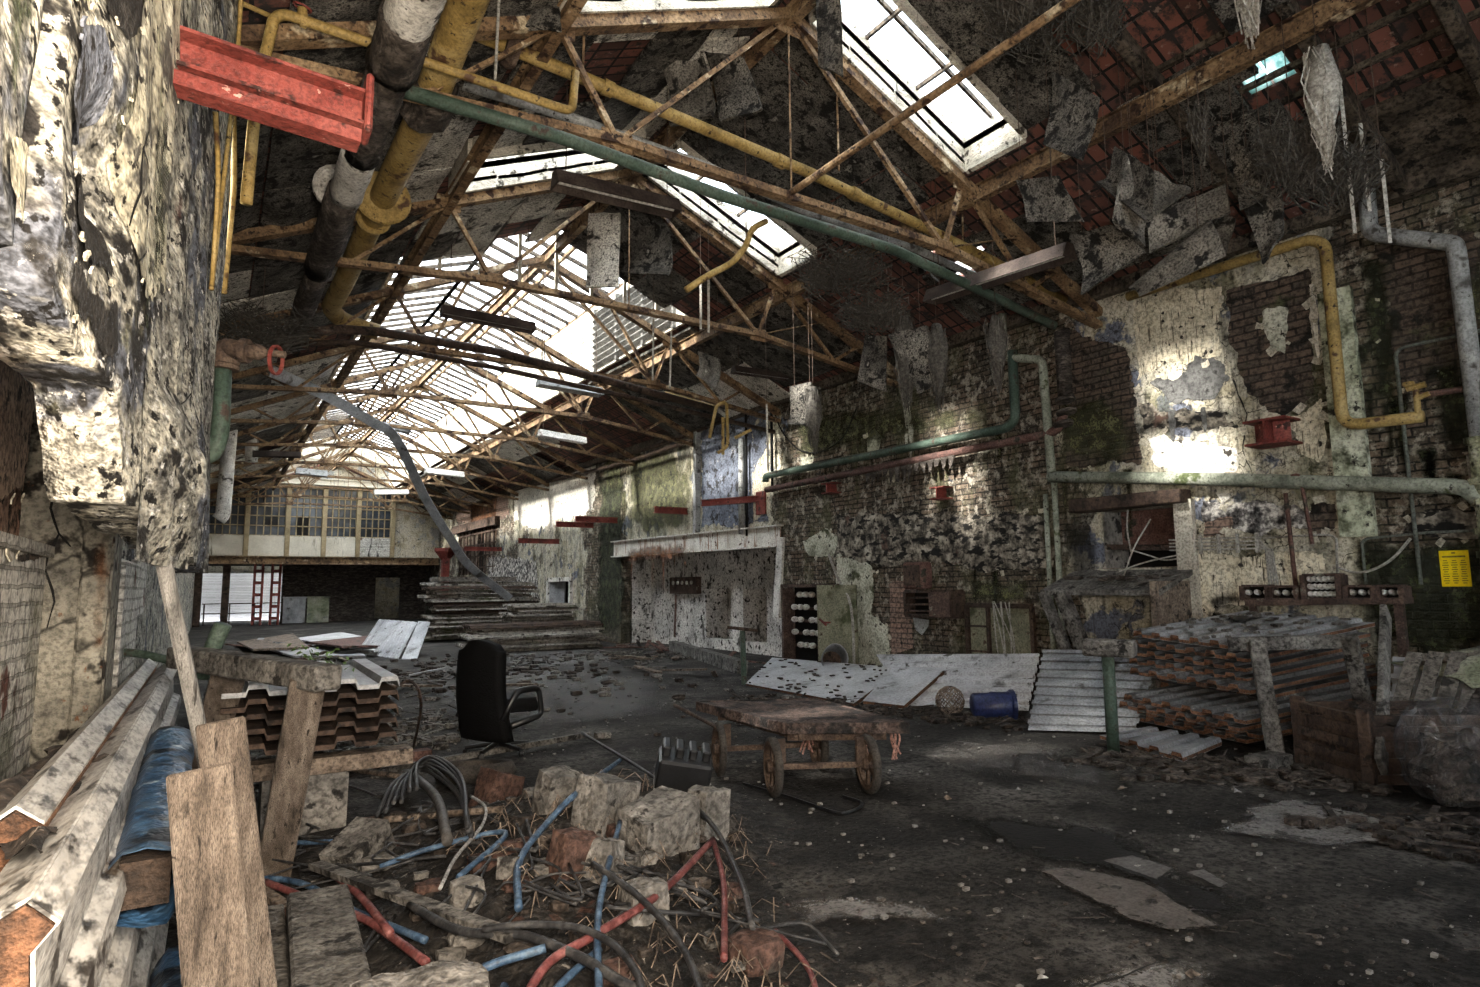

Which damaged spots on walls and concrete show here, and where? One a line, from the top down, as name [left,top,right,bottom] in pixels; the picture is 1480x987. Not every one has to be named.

water stain [13,0,25,76]
spalling [1375,229,1480,393]
flaking render [801,453,814,465]
flaking render [863,432,880,452]
flaking render [902,394,914,458]
flaking render [1061,266,1339,616]
spalling [803,508,1054,666]